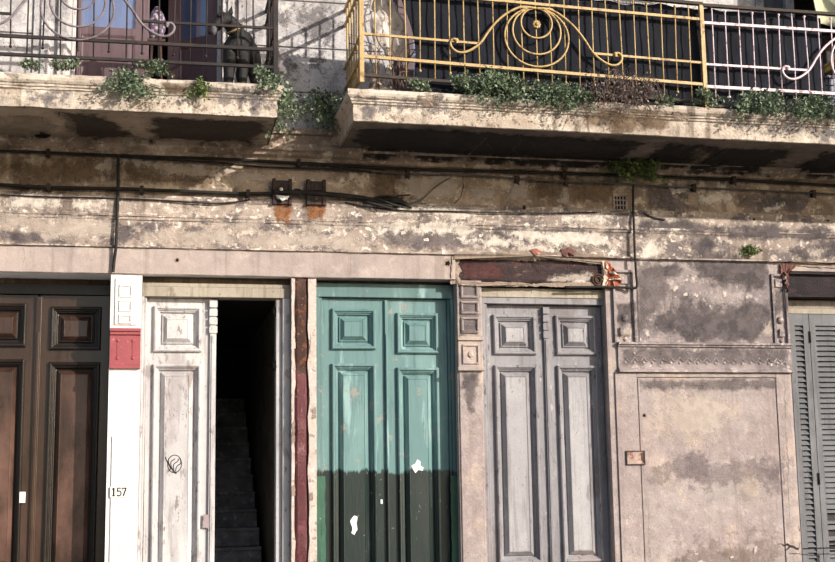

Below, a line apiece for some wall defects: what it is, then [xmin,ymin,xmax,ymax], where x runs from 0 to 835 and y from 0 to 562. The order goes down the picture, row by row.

damp [277,4,344,80]
damp [0,87,135,140]
damp [146,83,276,145]
damp [353,109,788,198]
peeling [0,193,114,241]
rust [274,205,292,225]
rust [308,204,327,219]
spalling [142,173,622,287]
damp [383,223,611,251]
damp [617,184,835,365]
damp [459,286,478,336]
damp [462,373,478,412]